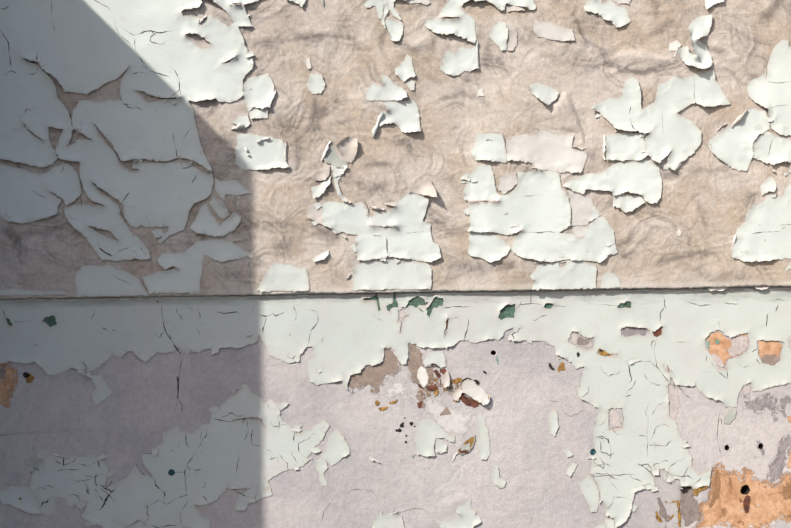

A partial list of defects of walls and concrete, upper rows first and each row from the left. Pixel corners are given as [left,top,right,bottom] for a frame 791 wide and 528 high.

crack [94,0,181,110]
peeling [0,0,276,261]
peeling [307,137,441,291]
peeling [366,54,421,137]
peeling [424,0,575,76]
peeling [460,15,730,290]
peeling [708,39,791,272]
crack [33,458,114,517]
crack [98,244,323,408]
crack [136,406,315,528]
peeling [0,239,791,528]
crack [593,295,758,507]